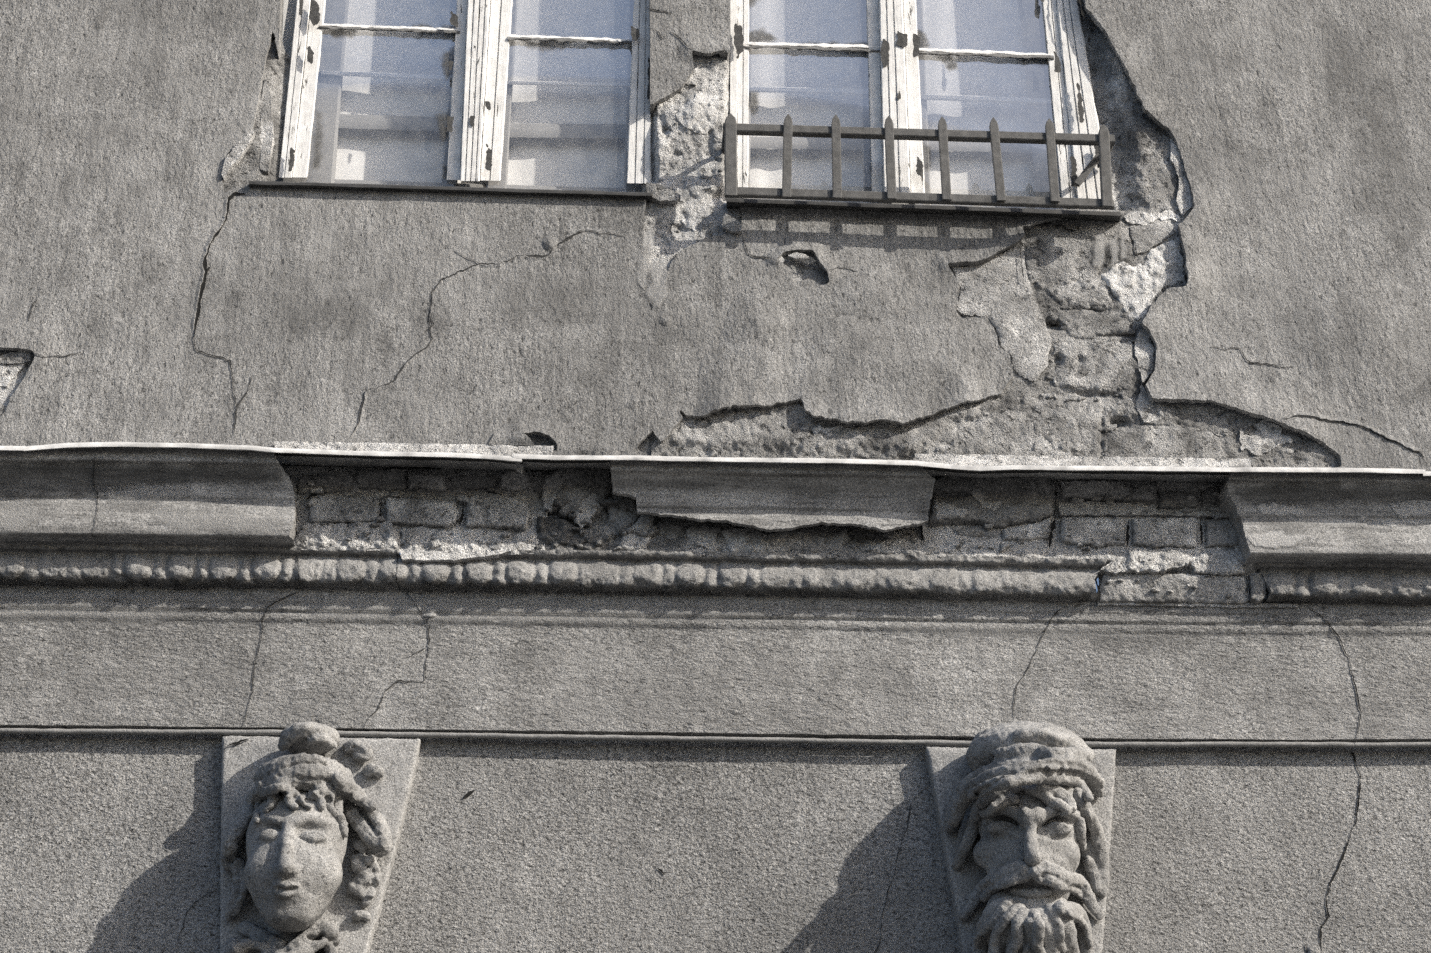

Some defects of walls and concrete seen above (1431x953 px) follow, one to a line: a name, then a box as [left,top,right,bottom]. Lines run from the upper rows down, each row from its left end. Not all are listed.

flaking render [221,37,314,193]
flaking render [0,350,35,417]
crack [191,186,252,436]
crack [350,230,618,439]
flaking render [274,0,1340,609]
crack [1305,607,1361,952]